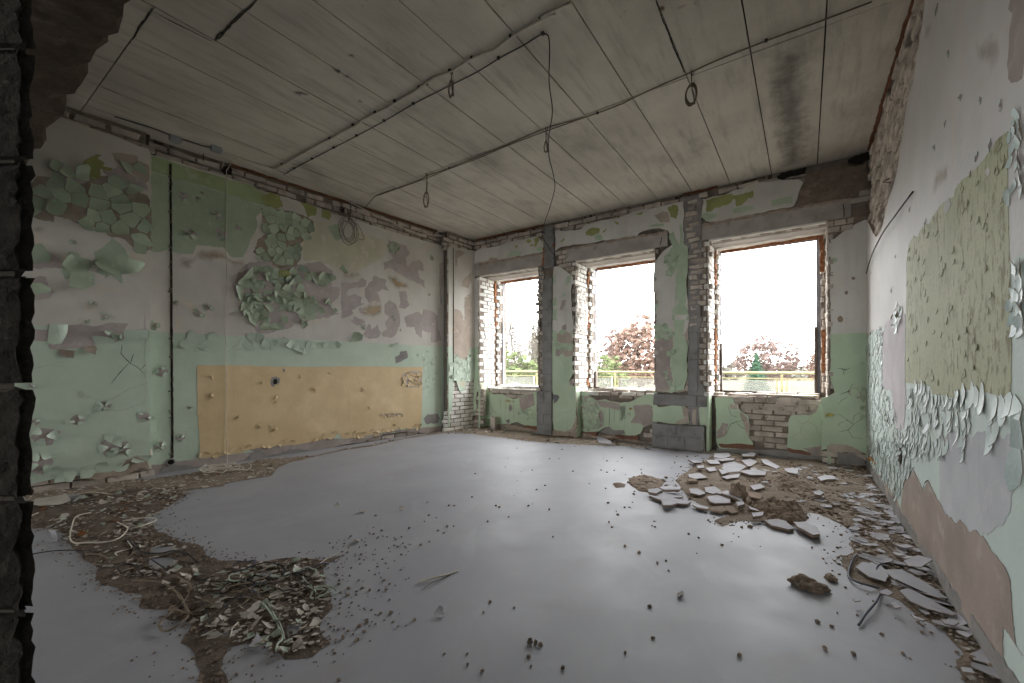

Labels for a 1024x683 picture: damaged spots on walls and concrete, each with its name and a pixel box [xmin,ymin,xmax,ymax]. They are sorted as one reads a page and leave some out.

flaking render [29,0,938,574]
flaking render [796,249,1024,657]
peeling [961,99,1022,233]